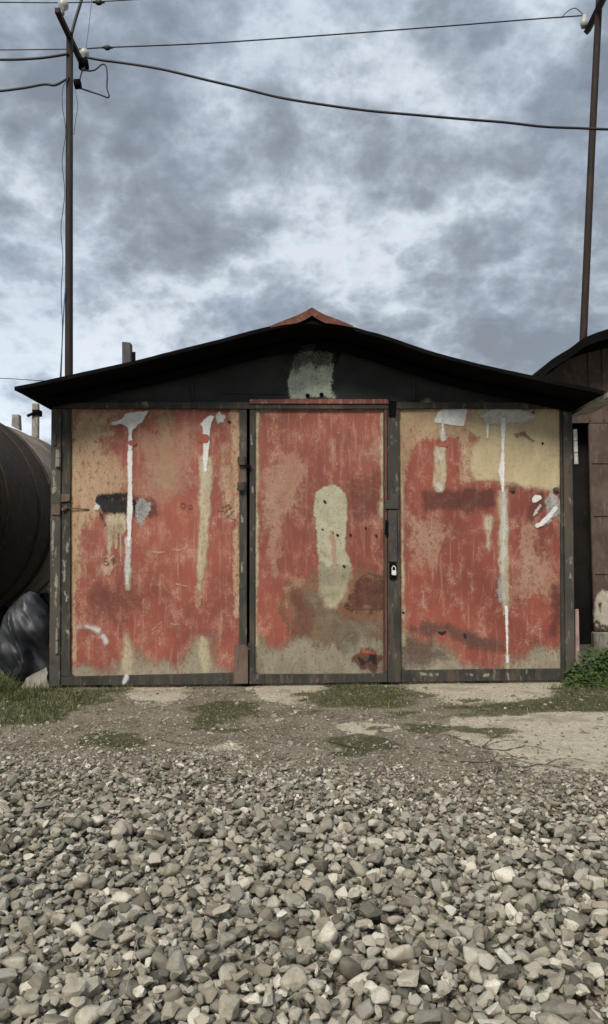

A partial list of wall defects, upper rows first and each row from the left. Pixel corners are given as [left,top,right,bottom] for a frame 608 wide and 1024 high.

peeling [255,485,388,686]
rust [344,573,388,614]
peeling [68,635,237,688]
rust [351,647,383,673]
peeling [397,634,563,685]